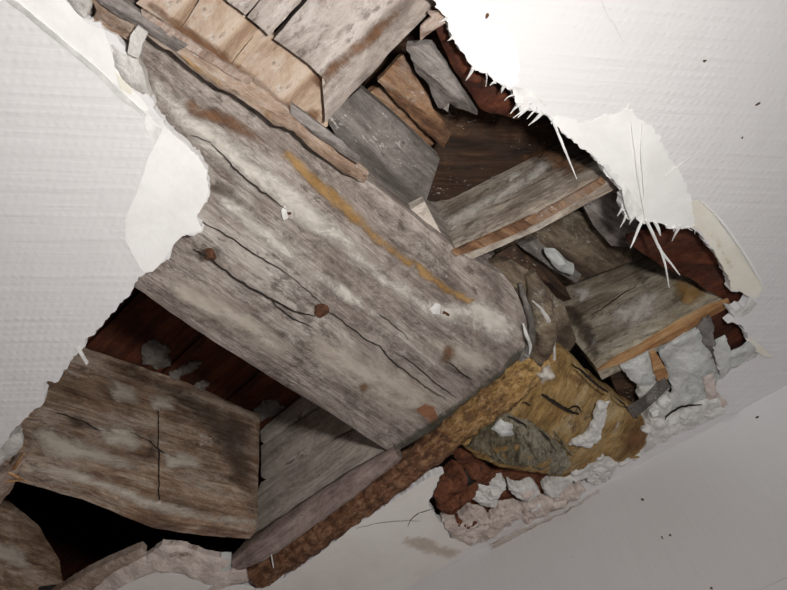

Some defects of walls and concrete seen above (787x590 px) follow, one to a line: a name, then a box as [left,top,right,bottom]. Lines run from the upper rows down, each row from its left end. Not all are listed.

flaking render [16,0,157,111]
flaking render [125,127,208,272]
peeling [435,0,762,317]
spalling [0,425,24,465]
flaking render [92,391,726,590]